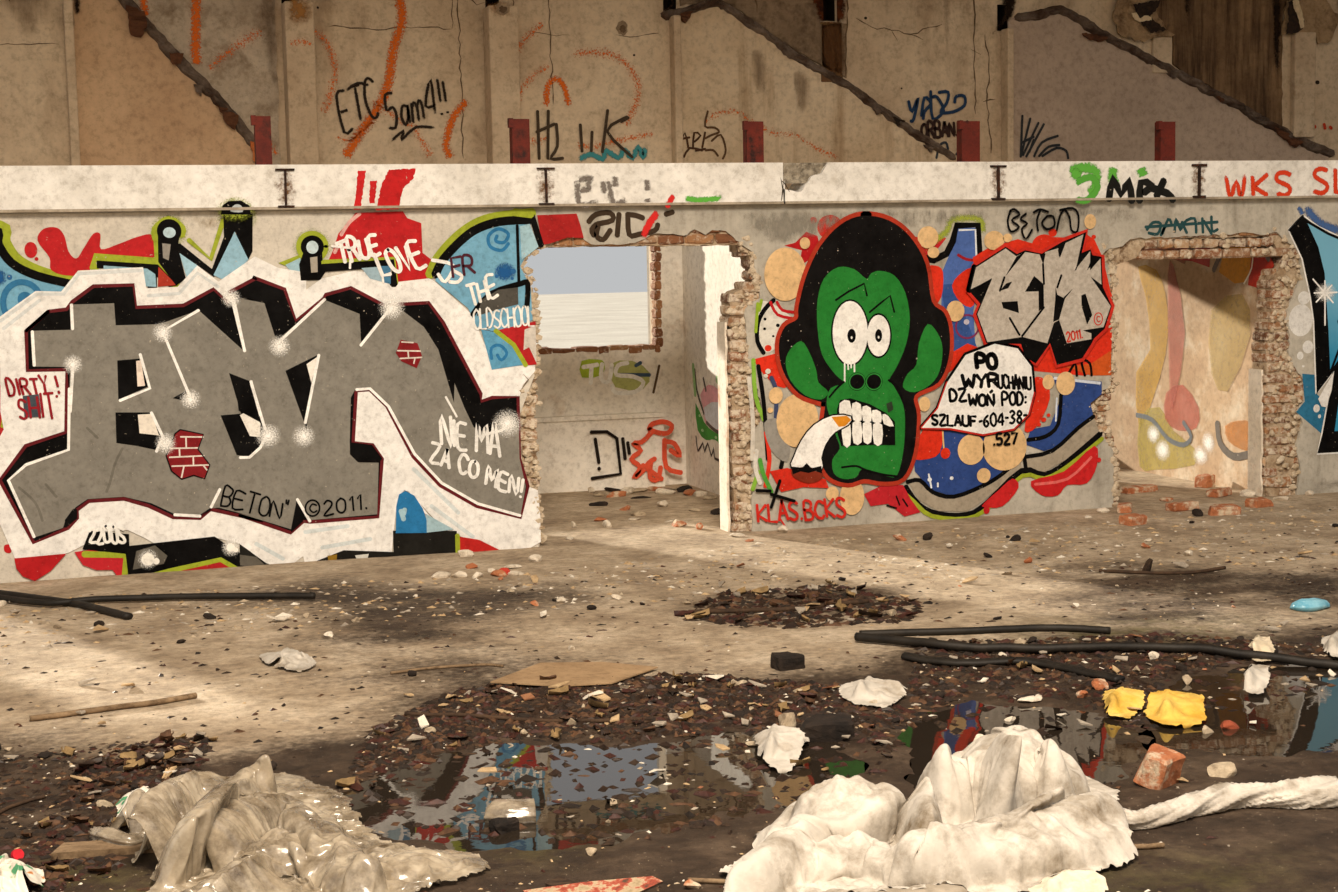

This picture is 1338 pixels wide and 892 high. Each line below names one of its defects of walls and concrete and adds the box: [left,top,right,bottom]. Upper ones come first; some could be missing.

spalling [1014,5,1335,158]
water stain [1273,0,1281,68]
flaking render [519,230,763,545]
flaking render [1089,243,1122,507]
flaking render [1132,227,1304,496]